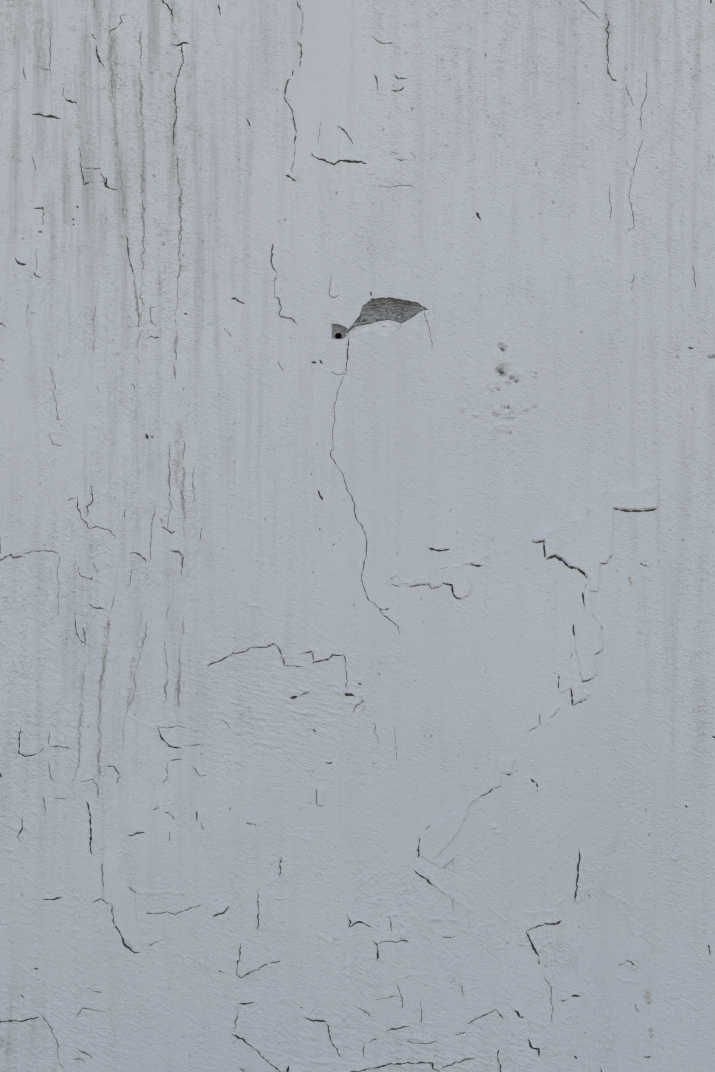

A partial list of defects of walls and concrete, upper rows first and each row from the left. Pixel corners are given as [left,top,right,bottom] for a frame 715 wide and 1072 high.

crack [92,14,124,66]
crack [79,148,116,190]
crack [162,0,188,260]
crack [15,207,44,278]
spalling [346,297,426,339]
crack [330,340,399,630]
crack [0,545,106,616]
crack [208,643,397,759]
peeling [558,585,604,706]
crack [232,860,289,1072]
crack [306,851,647,1072]